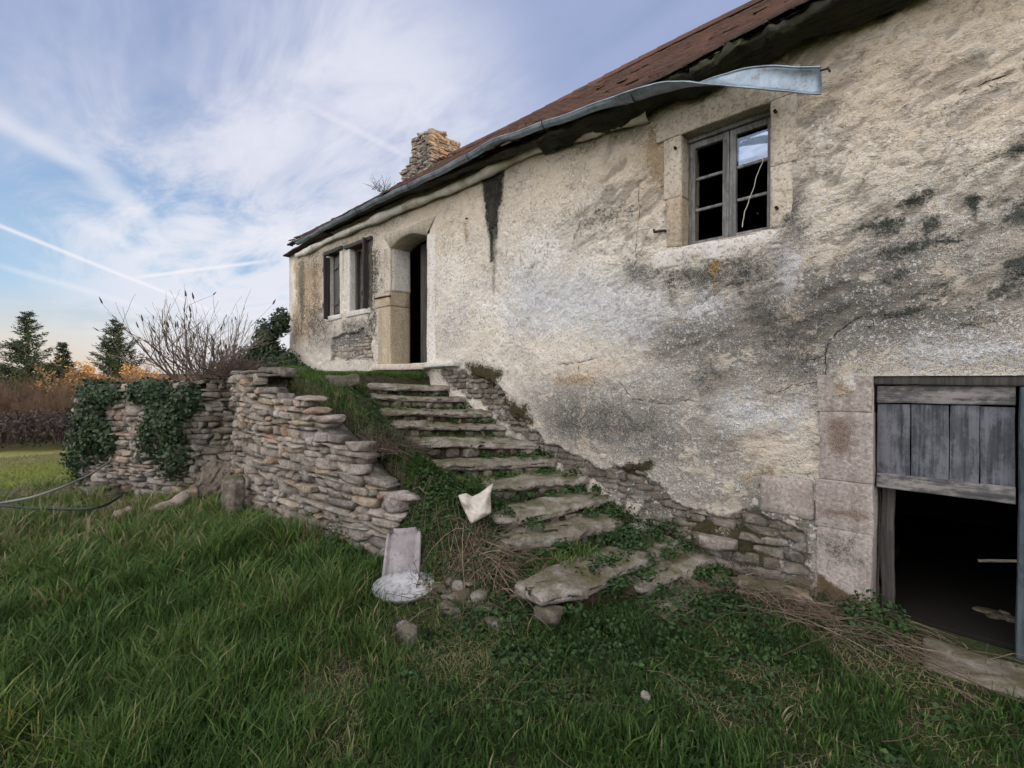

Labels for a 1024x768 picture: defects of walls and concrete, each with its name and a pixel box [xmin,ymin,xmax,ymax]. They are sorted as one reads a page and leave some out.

water stain [963,194,983,217]
water stain [479,167,892,378]
spalling [331,324,373,364]
crack [770,314,902,394]
spalling [437,368,816,588]